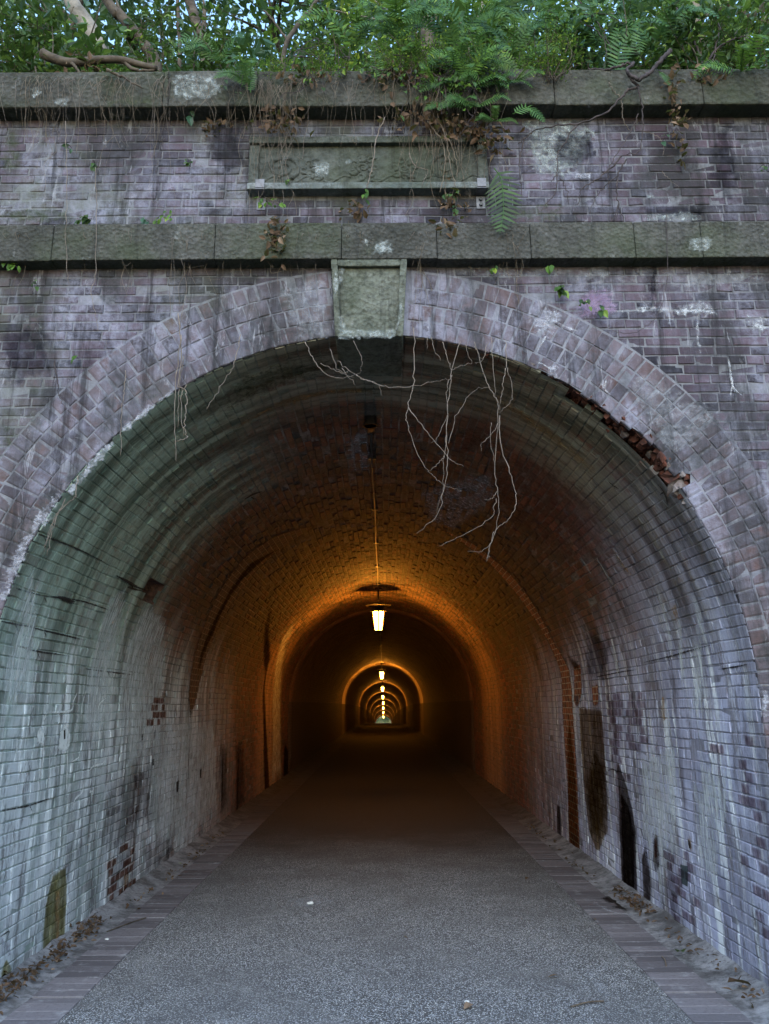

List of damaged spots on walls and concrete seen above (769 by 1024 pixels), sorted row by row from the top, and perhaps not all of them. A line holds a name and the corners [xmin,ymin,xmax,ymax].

spalling [530,362,690,505]
damp [579,709,677,901]
damp [44,870,66,948]